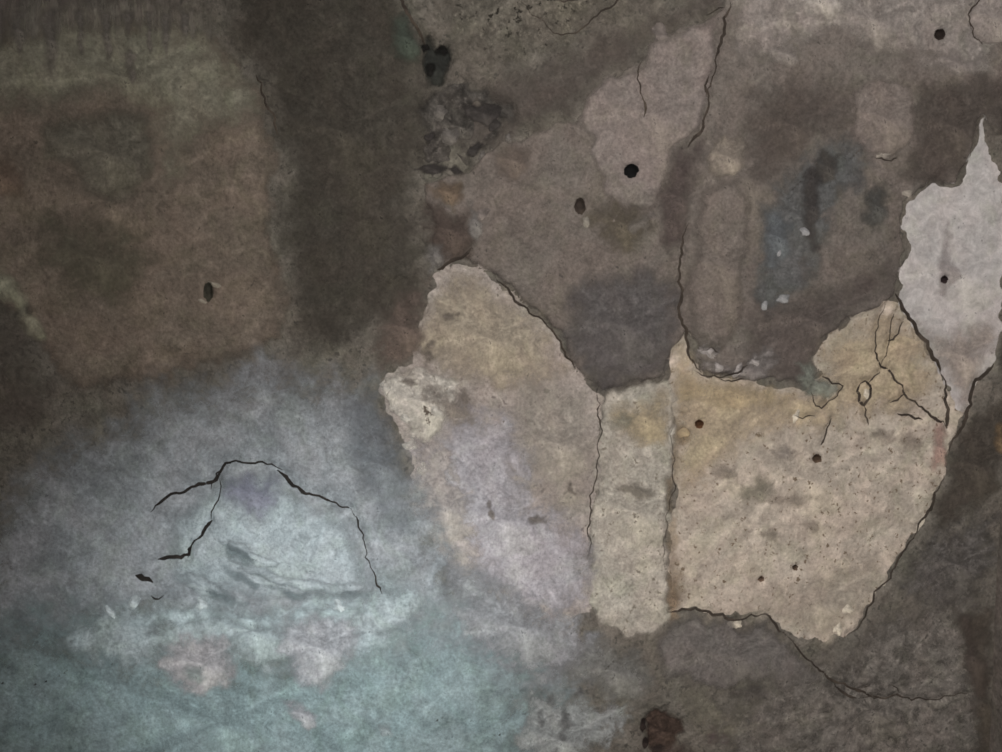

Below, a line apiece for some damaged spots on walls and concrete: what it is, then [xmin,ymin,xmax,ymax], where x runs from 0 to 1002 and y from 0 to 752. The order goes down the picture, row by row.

crack [521,0,619,36]
crack [688,2,731,147]
crack [677,223,747,382]
flaking render [378,0,1002,752]
crack [135,460,382,600]
crack [795,293,994,635]
crack [670,607,966,701]